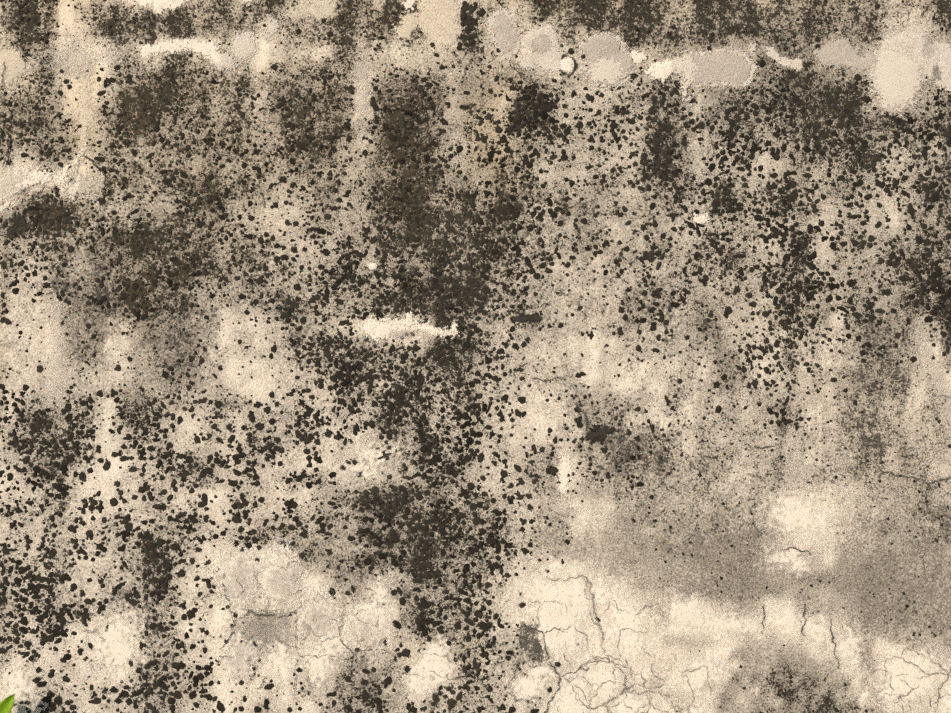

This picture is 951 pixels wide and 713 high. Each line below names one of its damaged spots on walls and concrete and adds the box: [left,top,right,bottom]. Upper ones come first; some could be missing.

spalling [361,311,460,343]
damp [221,599,289,649]
crack [413,575,730,713]
damp [718,635,882,713]
crack [830,618,841,673]
damp [851,535,951,648]
crack [871,644,951,712]